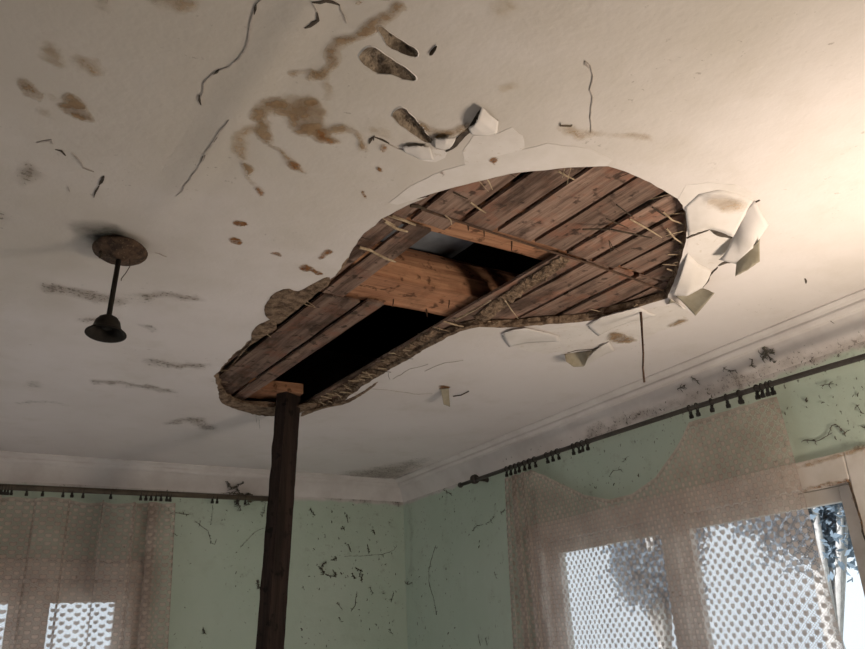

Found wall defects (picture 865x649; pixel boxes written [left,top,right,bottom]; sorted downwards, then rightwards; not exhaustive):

crack [198,0,261,105]
water stain [310,4,403,79]
spalling [357,25,437,81]
crack [560,61,593,127]
crack [176,121,228,196]
water stain [235,99,347,175]
peeling [384,106,616,218]
peeling [304,182,769,412]